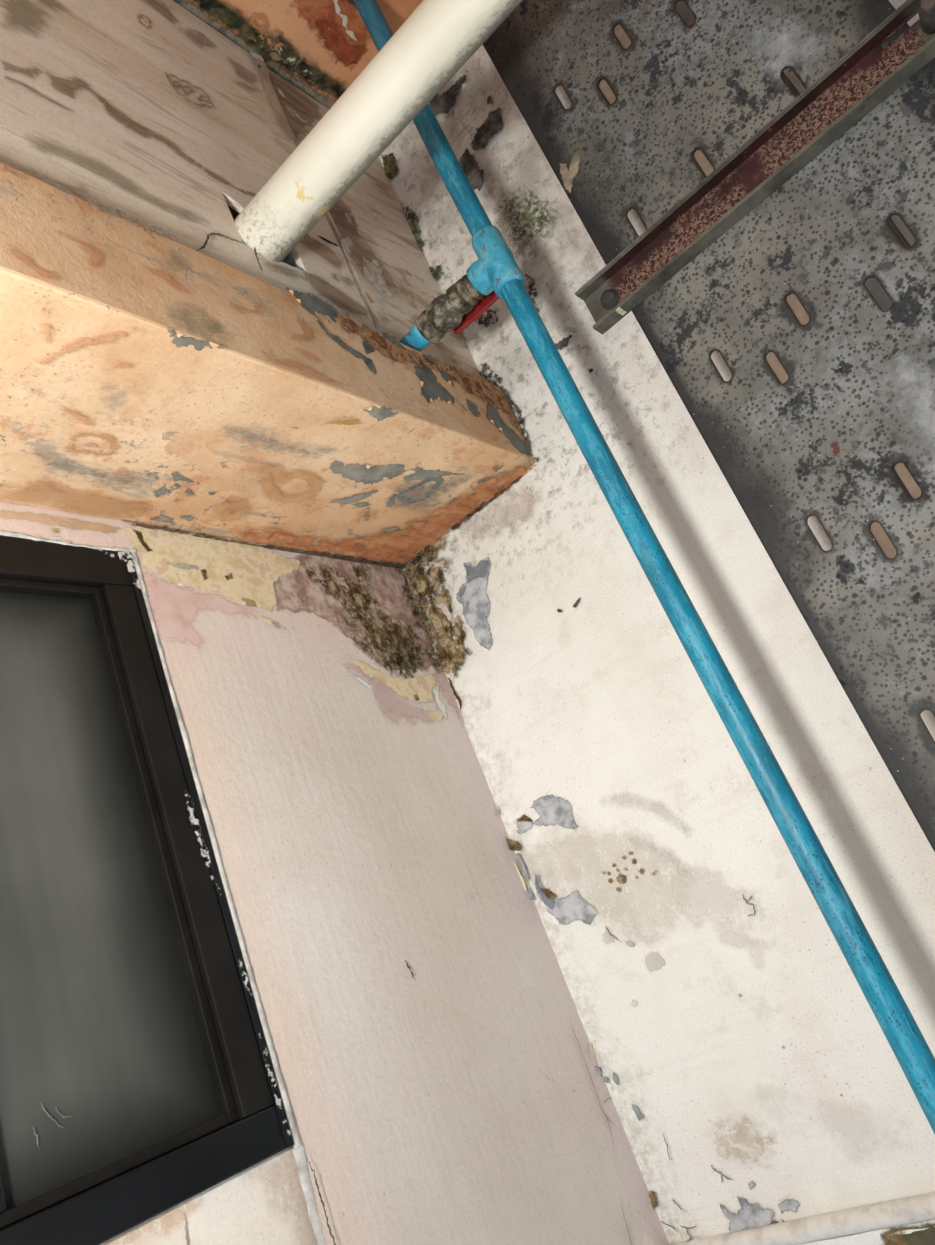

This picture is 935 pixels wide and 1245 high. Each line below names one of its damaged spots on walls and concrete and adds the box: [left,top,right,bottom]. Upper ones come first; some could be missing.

peeling [459,95,503,192]
crack [176,233,263,294]
peeling [164,323,224,351]
flaking render [286,287,532,456]
peeling [325,460,463,521]
peeling [123,472,301,630]
water stain [0,483,471,679]
peeling [456,557,493,650]
peeling [518,862,598,925]
water stain [506,838,675,947]
peeling [720,1181,800,1232]
water stain [881,1223,935,1245]